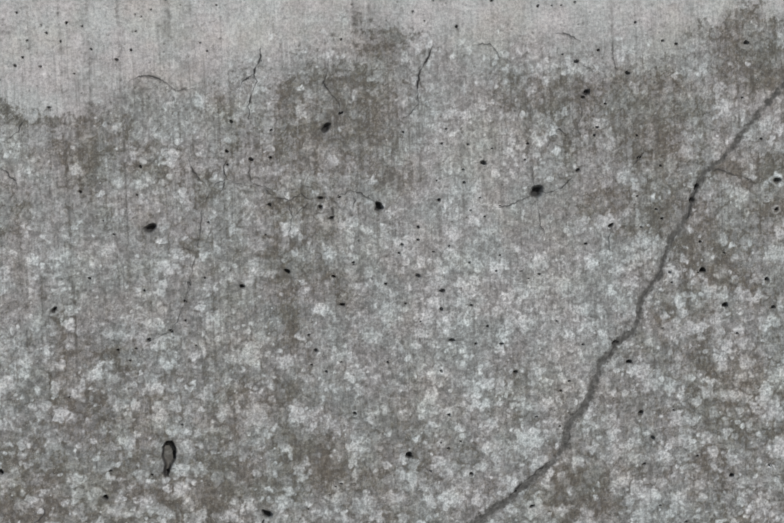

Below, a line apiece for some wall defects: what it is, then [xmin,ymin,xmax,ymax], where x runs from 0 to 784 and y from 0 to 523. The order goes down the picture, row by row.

crack [403,43,434,118]
crack [472,42,501,63]
crack [555,32,582,42]
crack [611,42,619,83]
damp [475,0,784,445]
damp [0,17,485,523]
crack [467,78,784,523]
damp [688,448,743,486]